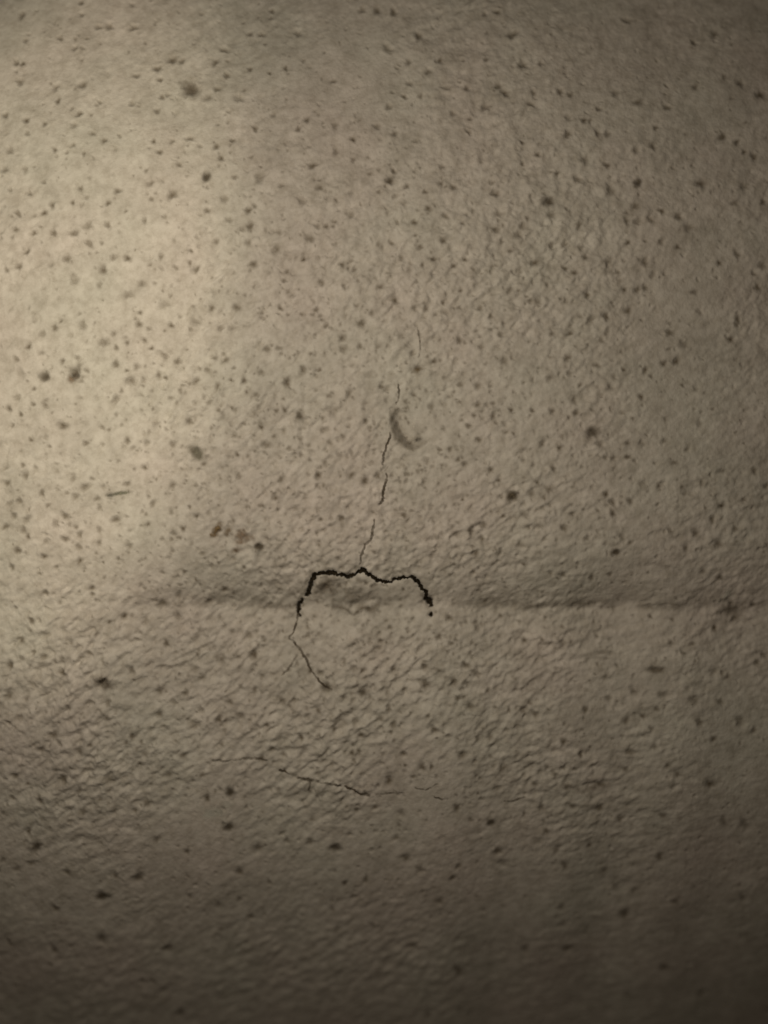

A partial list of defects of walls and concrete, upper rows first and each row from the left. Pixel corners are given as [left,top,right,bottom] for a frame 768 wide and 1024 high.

crack [293,435,433,688]